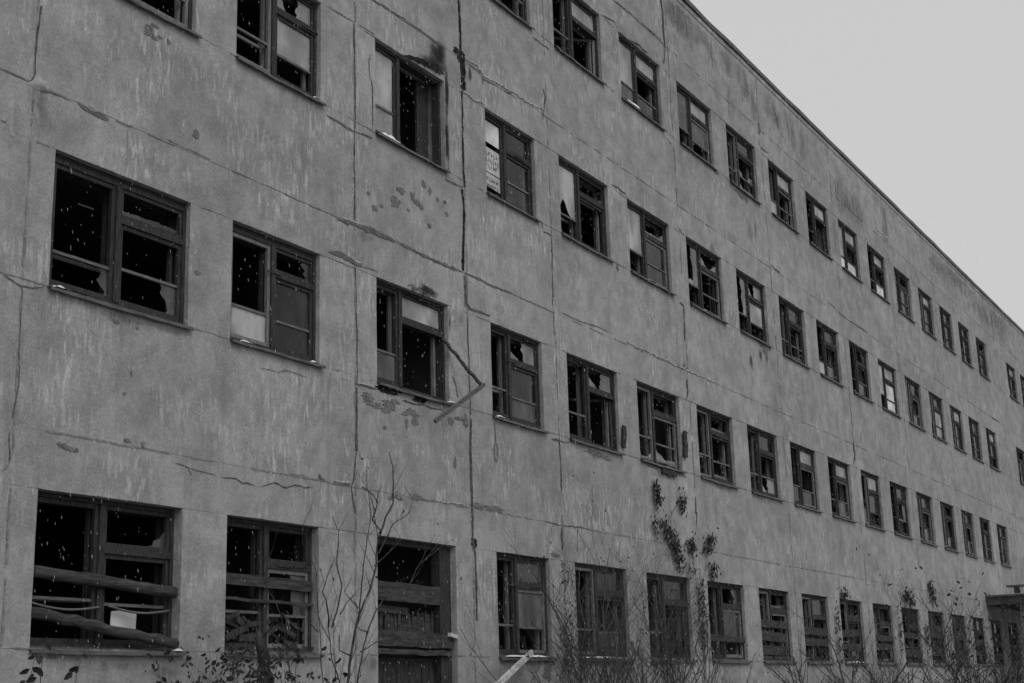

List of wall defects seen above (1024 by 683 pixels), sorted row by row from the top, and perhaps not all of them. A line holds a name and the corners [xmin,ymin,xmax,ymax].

crack [331,7,375,130]
spalling [367,180,449,216]
crack [2,274,44,470]
spalling [358,383,427,457]
crack [174,462,310,489]